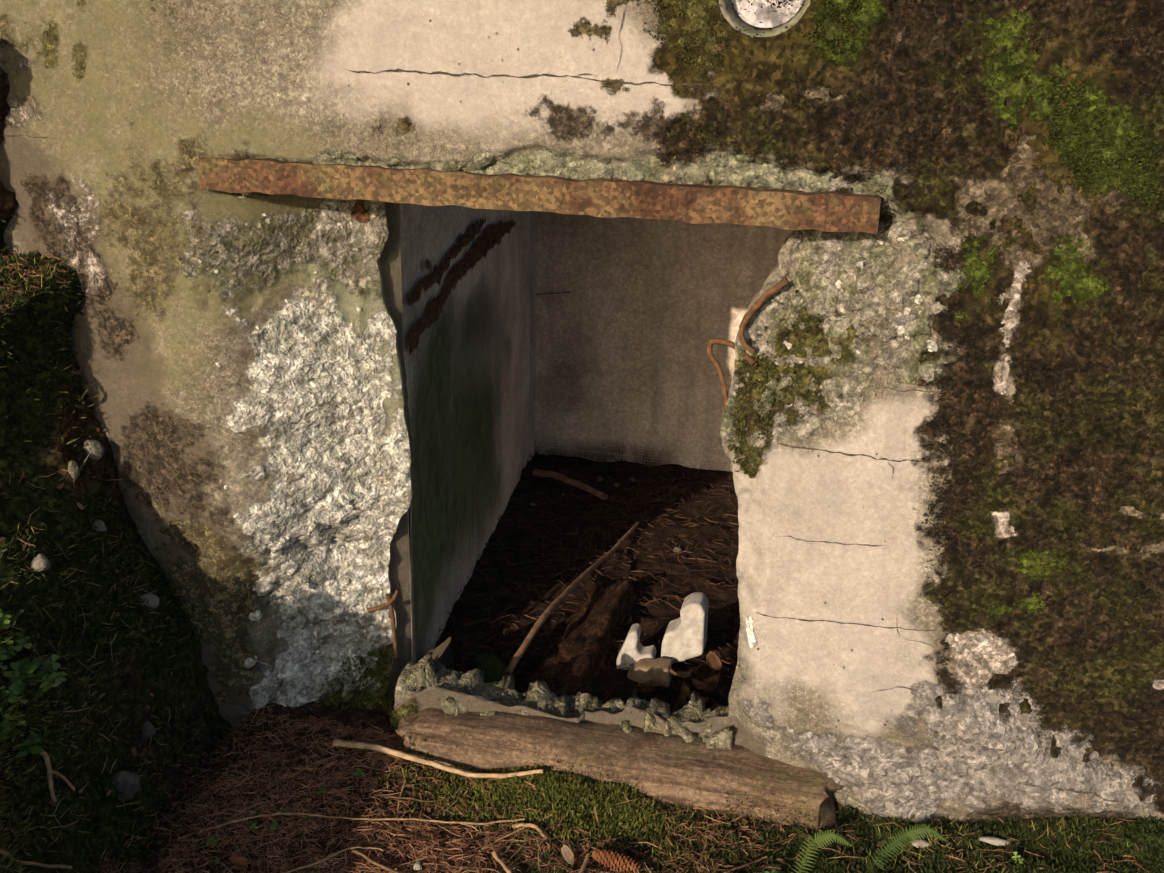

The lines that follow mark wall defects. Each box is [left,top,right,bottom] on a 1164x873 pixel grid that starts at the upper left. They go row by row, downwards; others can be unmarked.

crack [348,7,701,86]
rust [351,199,370,223]
rust [408,217,516,356]
spalling [246,147,968,453]
spalling [165,198,411,710]
crack [776,443,936,477]
crack [779,536,881,547]
crack [758,613,939,648]
peeling [945,628,1018,689]
spalling [729,676,988,823]